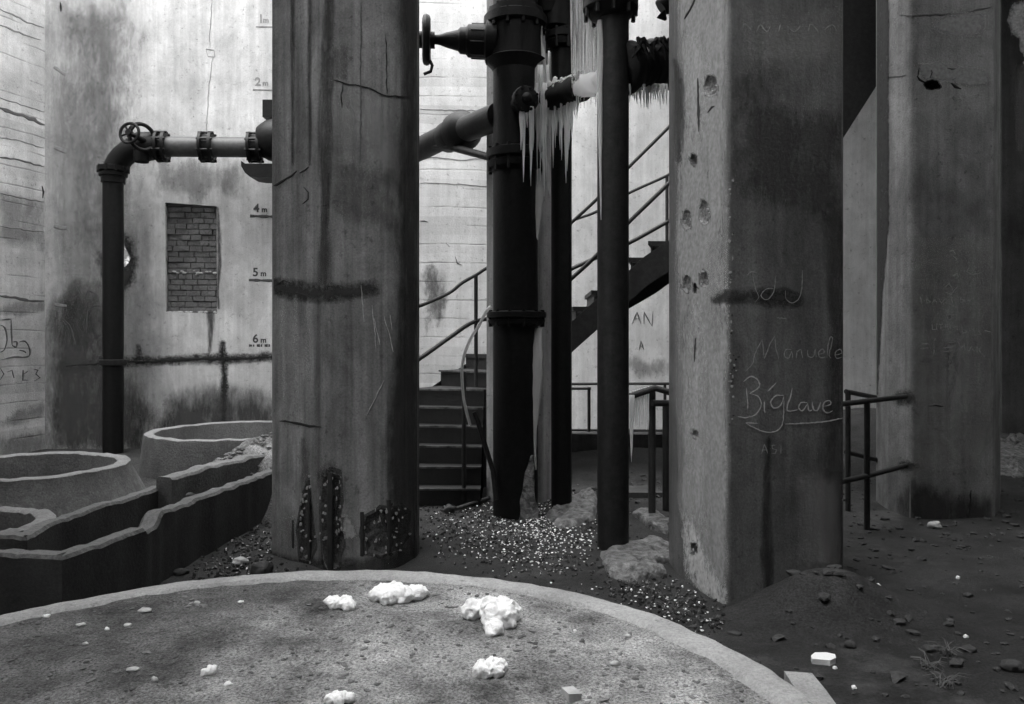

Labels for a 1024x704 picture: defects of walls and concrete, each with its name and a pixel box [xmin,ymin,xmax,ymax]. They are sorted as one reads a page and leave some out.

crack [335,7,476,159]
spalling [704,74,718,113]
spalling [682,199,711,231]
leakage [281,0,445,571]
spalling [682,269,709,294]
spalling [291,466,411,571]